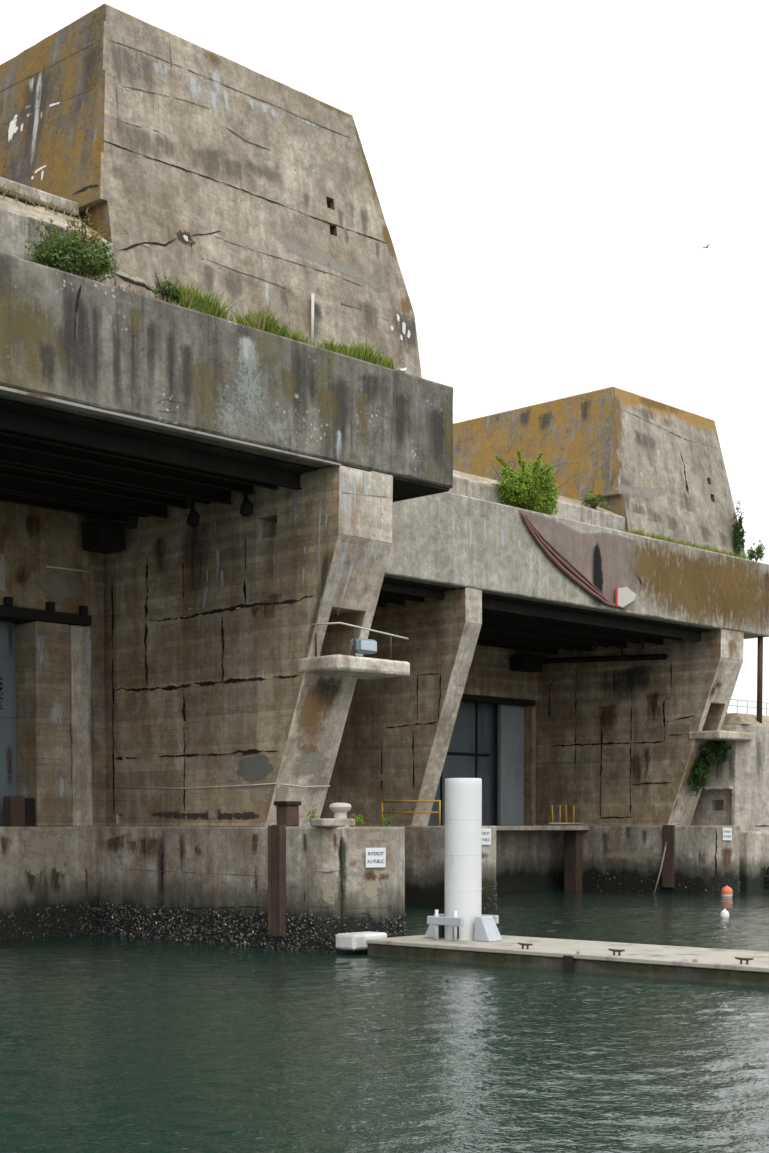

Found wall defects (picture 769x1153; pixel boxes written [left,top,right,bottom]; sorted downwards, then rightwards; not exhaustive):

crack [0,39,386,243]
leakage [42,296,98,382]
crack [73,285,81,348]
leakage [168,336,217,418]
leakage [240,337,254,361]
crack [116,231,389,321]
leakage [295,360,378,453]
leakage [391,314,415,347]
leakage [432,408,453,453]
crack [111,536,312,815]
crack [548,664,695,819]
corrosion [107,836,157,855]